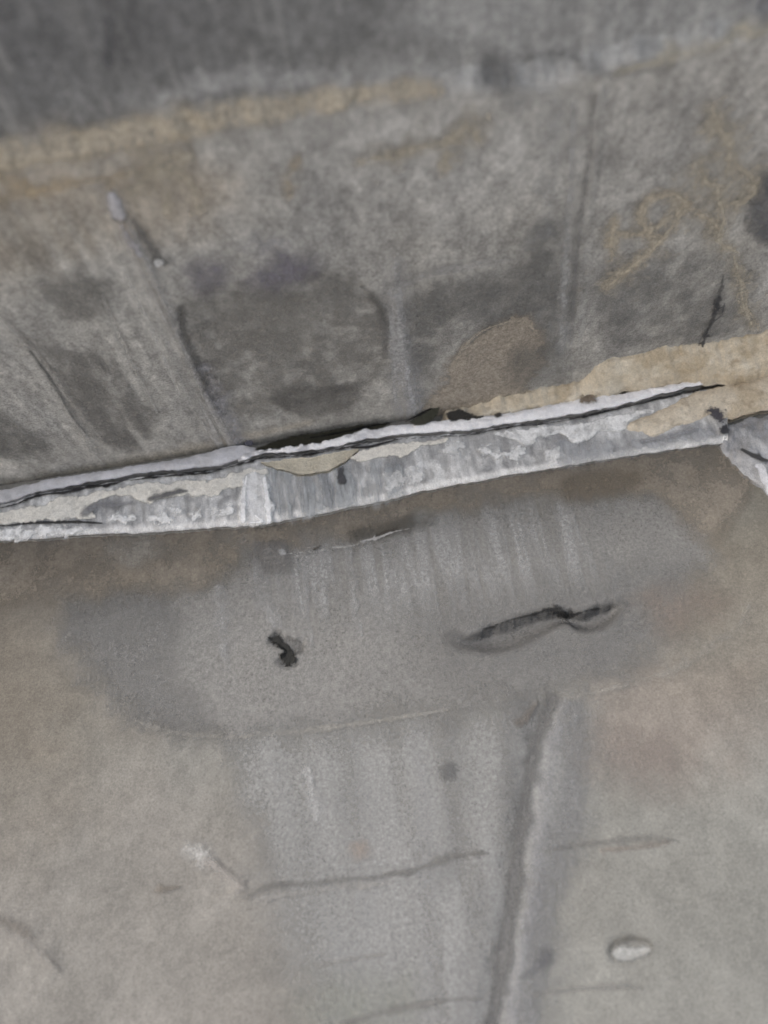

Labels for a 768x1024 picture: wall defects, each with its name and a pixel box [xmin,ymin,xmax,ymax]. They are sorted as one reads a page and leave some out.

leakage [177,253,387,446]
crack [699,279,725,347]
peeling [0,407,654,542]
peeling [278,528,410,555]
crack [0,385,717,526]
leakage [0,428,750,610]
spalling [719,415,768,496]
spalling [268,633,303,667]
leakage [238,694,593,1024]
crack [362,851,487,887]